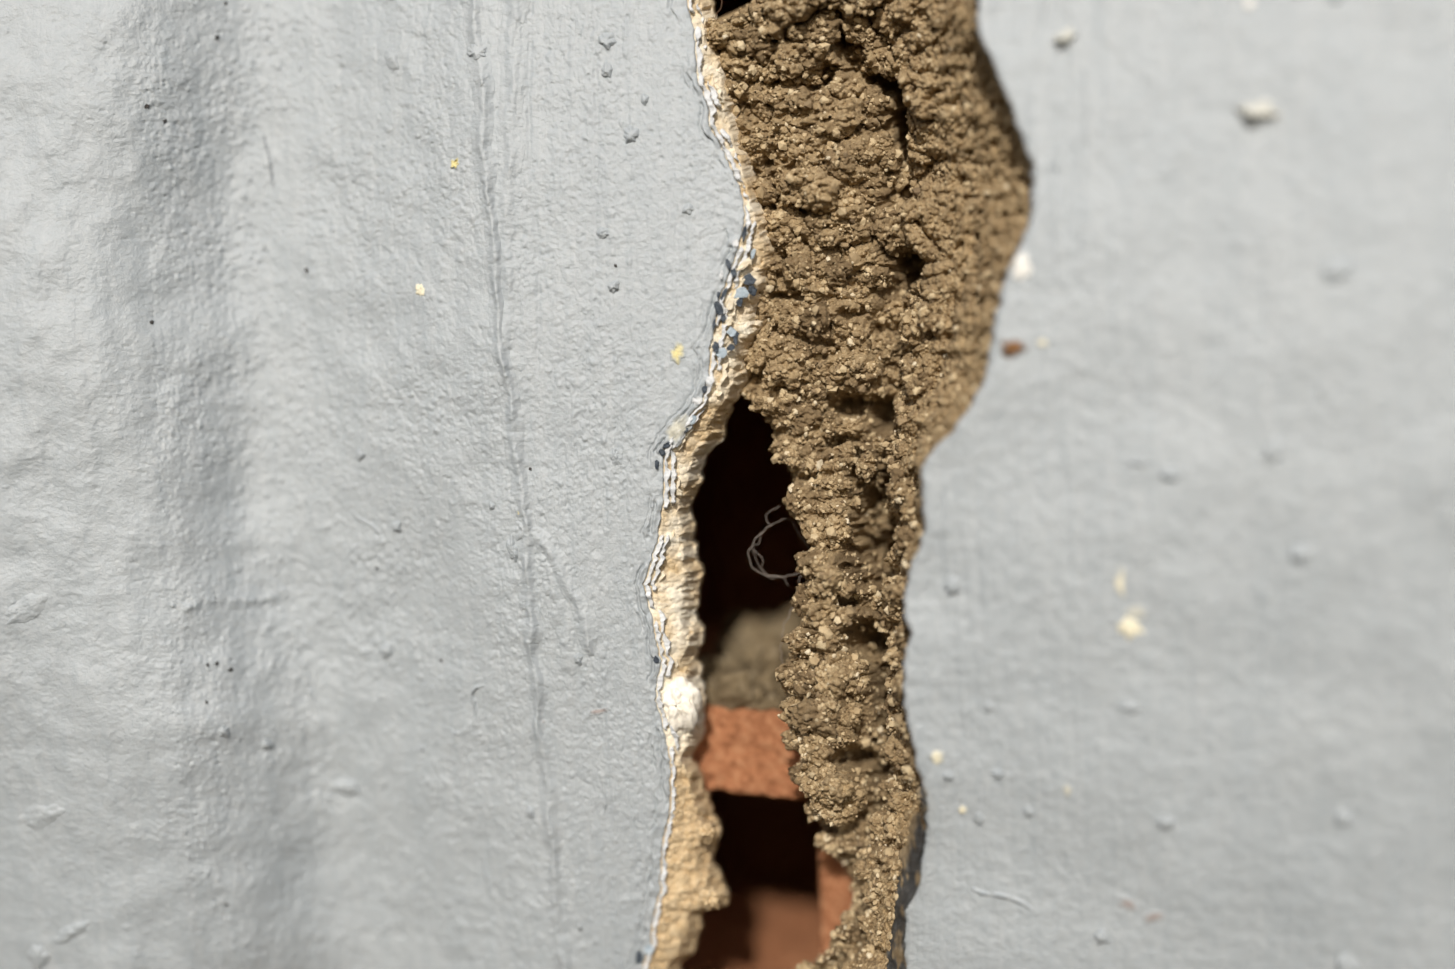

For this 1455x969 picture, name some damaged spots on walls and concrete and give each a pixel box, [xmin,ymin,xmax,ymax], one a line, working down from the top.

peeling [712,225,757,358]
peeling [655,376,715,469]
peeling [636,944,655,964]